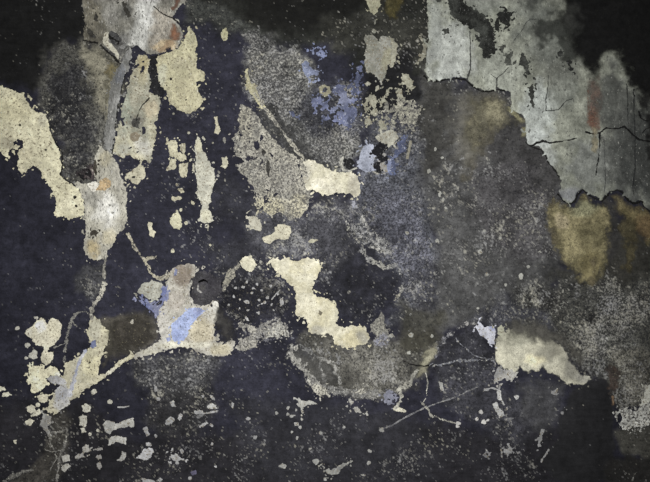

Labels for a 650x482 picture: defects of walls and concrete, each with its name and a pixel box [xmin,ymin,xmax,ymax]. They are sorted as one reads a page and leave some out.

flaking render [0,0,364,263]
peeling [344,0,425,179]
crack [423,31,509,92]
flaking render [415,0,650,211]
crack [545,75,573,111]
crack [525,83,650,212]
water stain [547,194,610,286]
water stain [614,196,650,270]
flaking render [15,259,237,439]
flaking render [222,253,395,354]
crack [394,338,496,424]
flaking render [484,323,591,425]